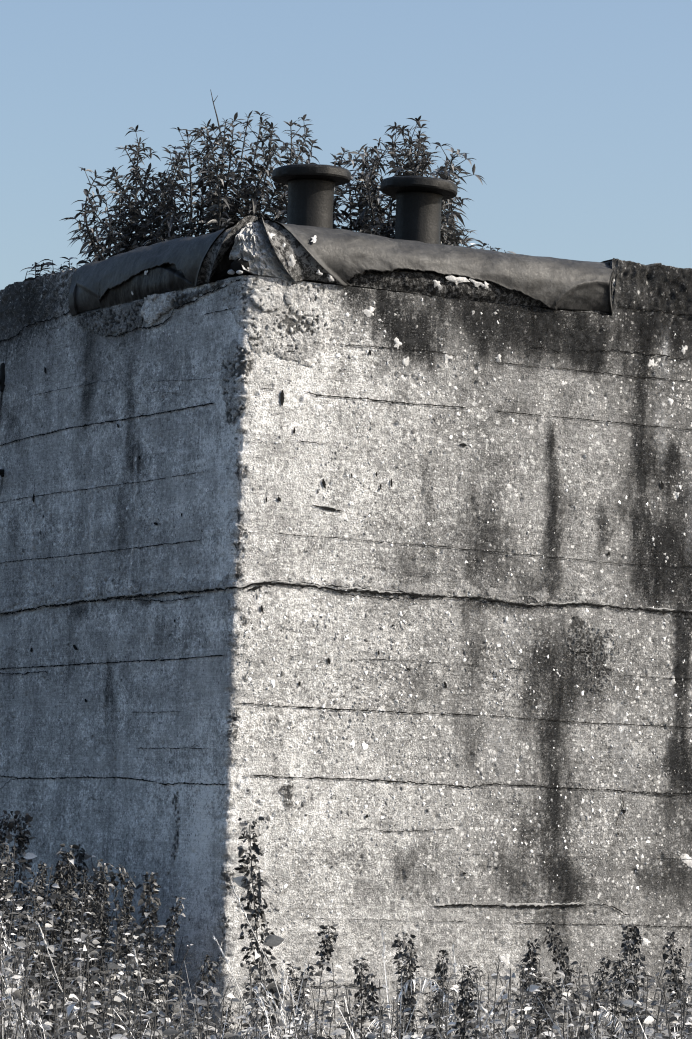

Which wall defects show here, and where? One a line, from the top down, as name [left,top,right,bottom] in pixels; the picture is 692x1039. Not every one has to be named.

spalling [77,221,337,769]
crack [0,580,692,620]
damp [342,261,692,852]
damp [502,626,603,949]